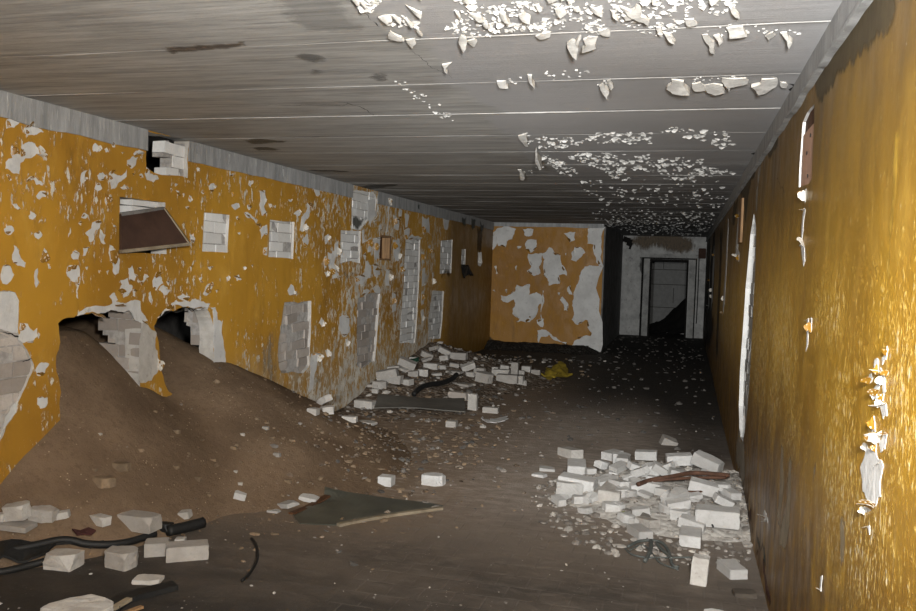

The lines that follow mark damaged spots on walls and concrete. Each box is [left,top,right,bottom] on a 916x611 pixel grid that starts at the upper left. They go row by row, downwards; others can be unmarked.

peeling [352,0,423,48]
peeling [444,0,801,80]
peeling [667,76,794,96]
spalling [0,246,51,436]
peeling [5,119,48,200]
flaking render [66,213,226,383]
spalling [80,140,217,209]
spalling [278,284,332,391]
spalling [339,198,437,368]
flaking render [492,127,739,352]
peeling [797,189,806,266]
peeling [858,346,889,515]